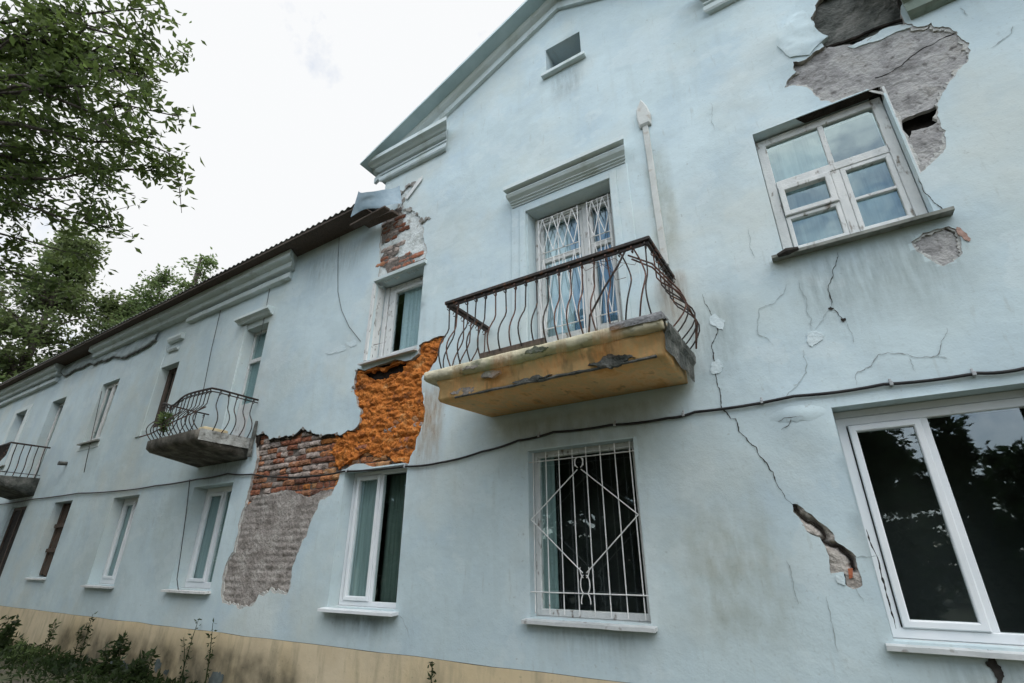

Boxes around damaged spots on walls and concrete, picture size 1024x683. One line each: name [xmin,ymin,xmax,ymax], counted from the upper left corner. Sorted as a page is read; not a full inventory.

spalling [785,0,970,173]
spalling [376,176,431,288]
spalling [911,227,971,266]
crack [757,253,854,342]
spalling [450,311,696,399]
crack [702,295,792,504]
crack [778,350,807,430]
crack [855,329,948,384]
spalling [198,337,444,609]
spalling [793,504,862,589]